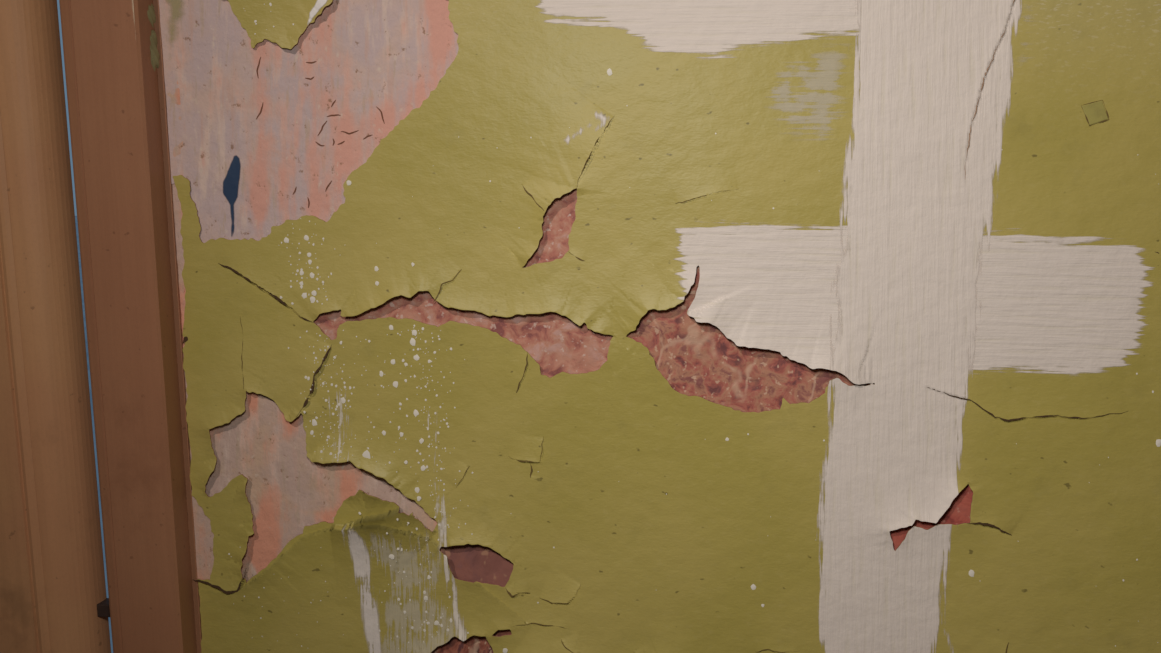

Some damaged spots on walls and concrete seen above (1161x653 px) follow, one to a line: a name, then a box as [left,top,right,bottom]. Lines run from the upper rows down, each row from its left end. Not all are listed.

crack [966,0,1015,158]
peeling [159,0,474,401]
spalling [297,175,875,432]
crack [927,387,1125,421]
peeling [190,373,530,601]
peeling [890,468,986,551]
spalling [411,621,521,653]